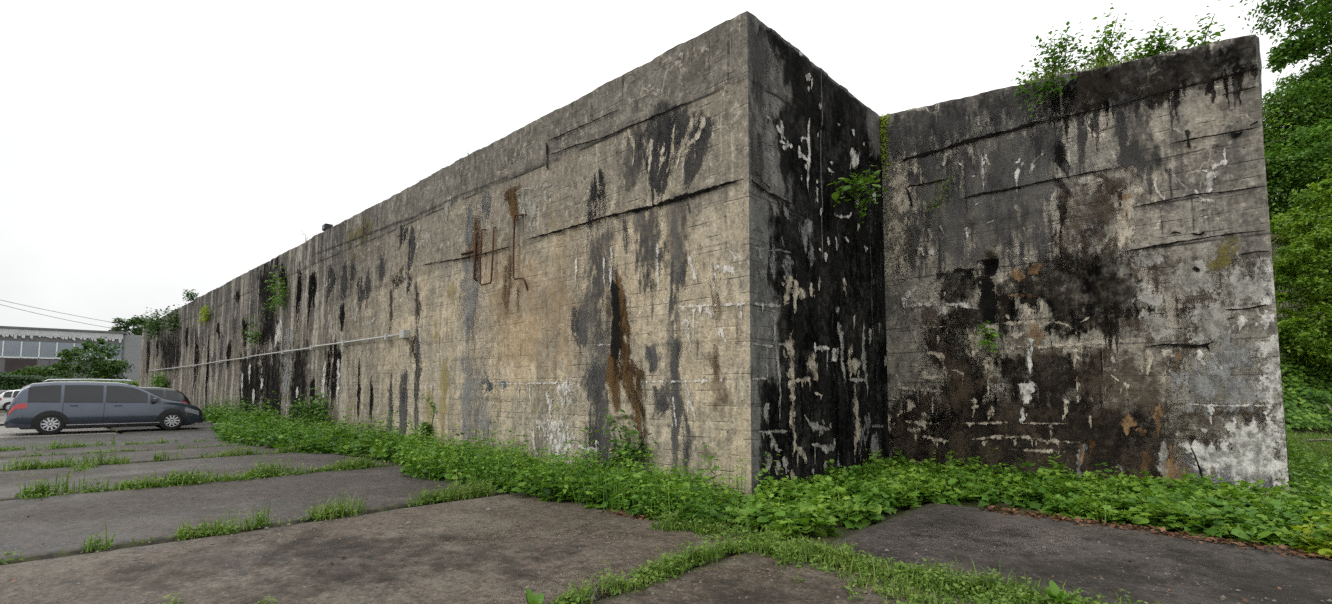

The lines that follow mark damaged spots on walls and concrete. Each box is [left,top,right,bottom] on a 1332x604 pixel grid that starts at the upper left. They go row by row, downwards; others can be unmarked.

rust [460,184,528,318]
leakage [145,18,1291,493]
rust [604,271,648,463]